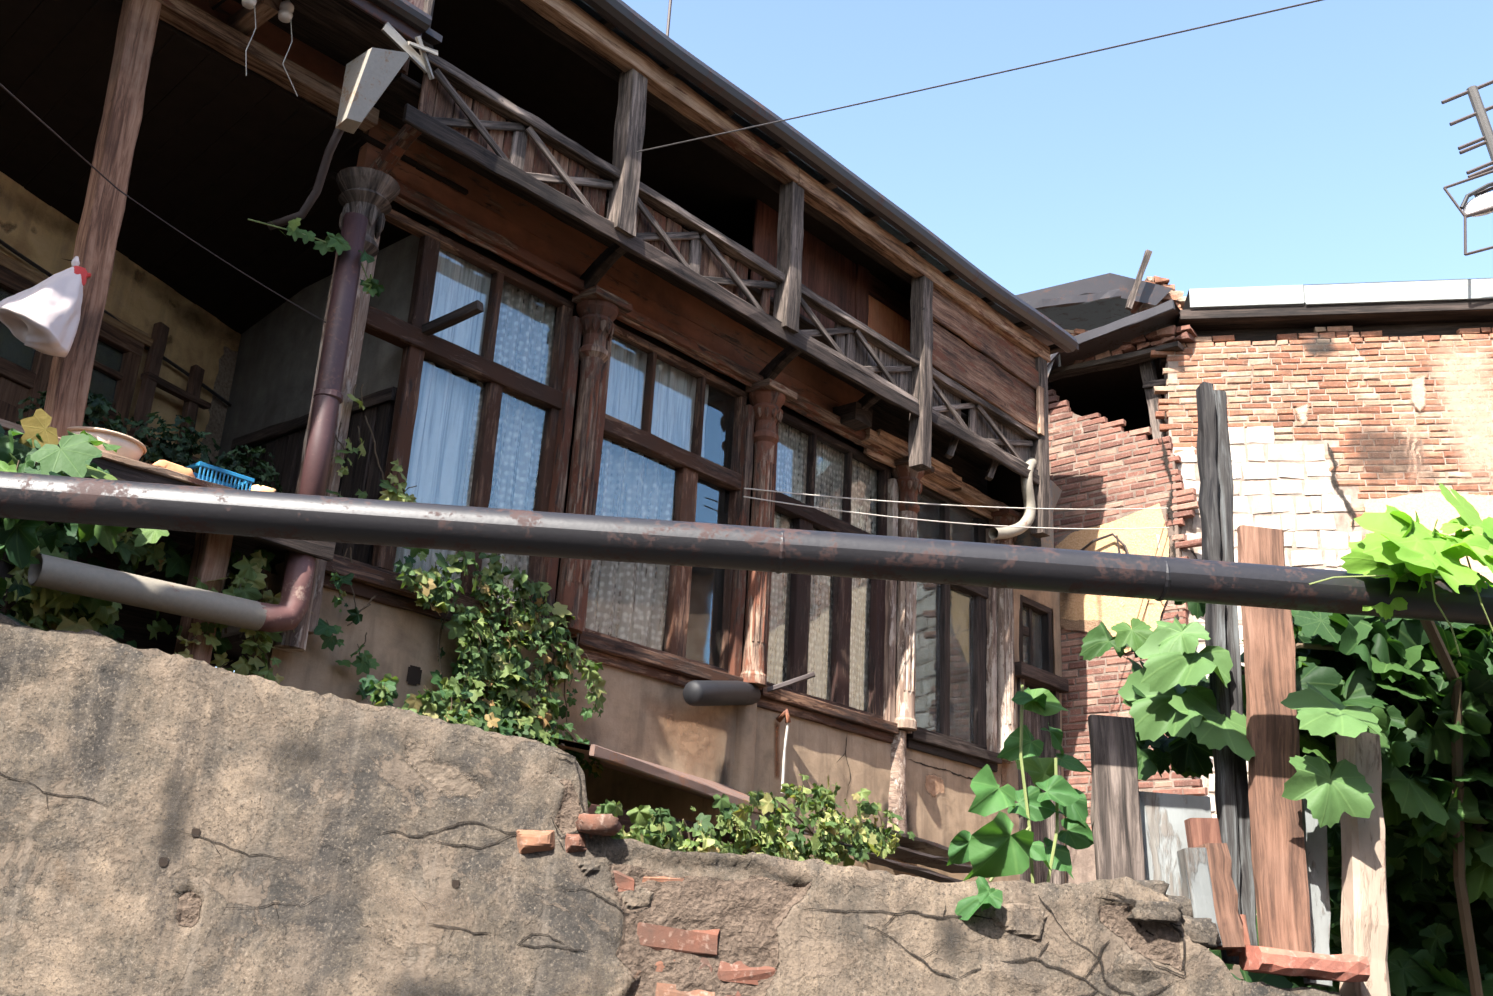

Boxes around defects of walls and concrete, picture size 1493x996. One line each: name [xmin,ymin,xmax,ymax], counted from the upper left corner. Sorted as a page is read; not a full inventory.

crack [0,773,106,811]
crack [380,821,517,848]
crack [551,751,585,850]
crack [553,877,651,915]
spalling [516,770,811,996]
crack [804,891,1186,996]